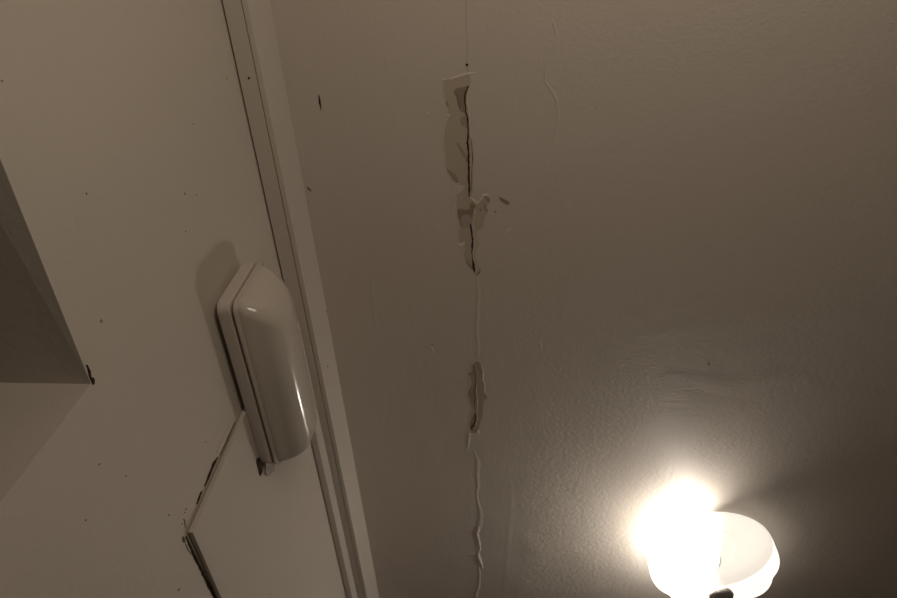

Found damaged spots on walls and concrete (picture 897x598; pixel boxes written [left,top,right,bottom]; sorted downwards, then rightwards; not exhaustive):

peeling [443,73,471,189]
crack [456,64,473,197]
crack [470,224,481,276]
peeling [457,196,510,276]
crack [470,366,478,430]
crack [183,423,235,598]